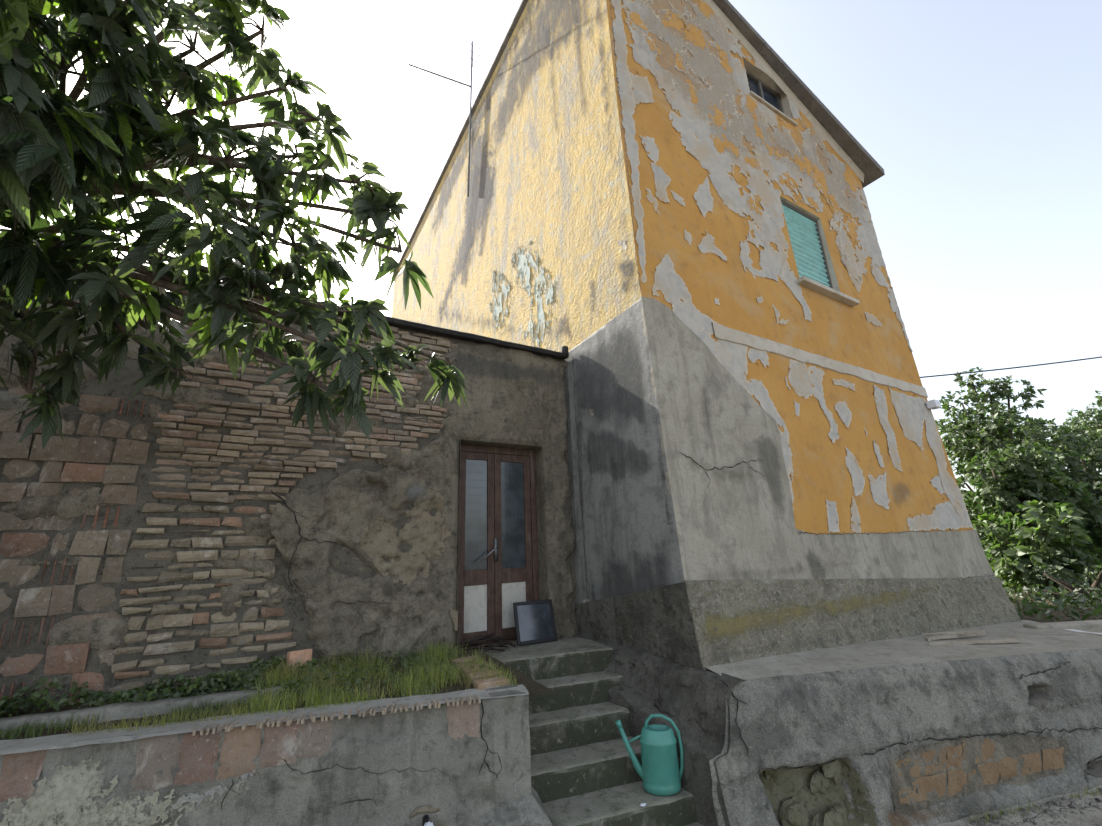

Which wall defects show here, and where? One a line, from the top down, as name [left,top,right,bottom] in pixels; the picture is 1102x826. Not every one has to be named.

leakage [432,0,585,321]
peeling [489,241,555,348]
leakage [620,261,633,292]
peeling [611,0,913,510]
leakage [565,334,644,422]
crack [679,451,766,492]
peeling [785,359,973,533]
crack [271,490,336,640]
crack [479,700,502,780]
crack [861,727,1102,760]
leakage [9,764,195,826]
spalling [760,758,877,826]